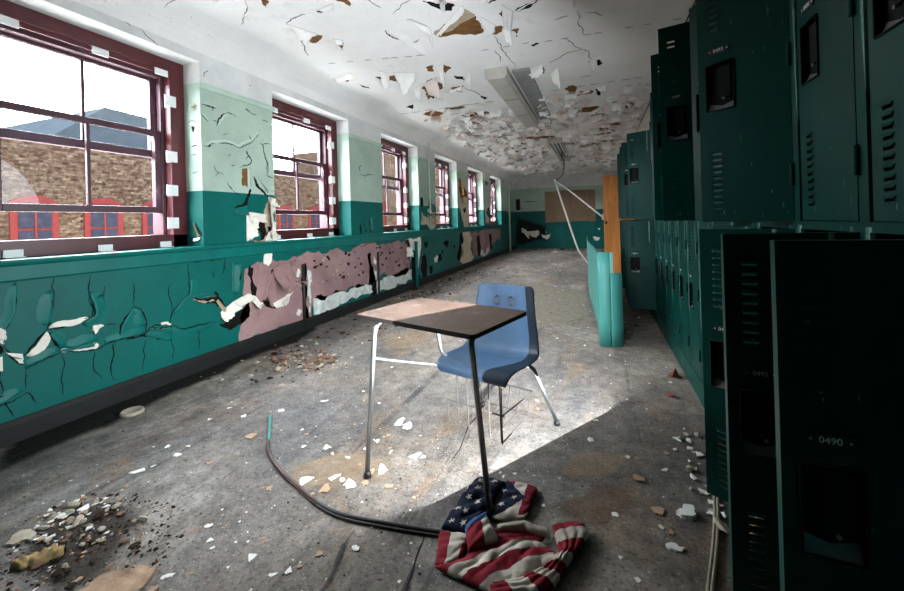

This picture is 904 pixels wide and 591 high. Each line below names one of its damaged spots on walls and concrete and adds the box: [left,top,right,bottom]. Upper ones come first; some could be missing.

peeling [286,14,322,56]
peeling [316,0,351,13]
peeling [406,0,538,48]
crack [487,32,601,69]
peeling [376,39,651,178]
crack [201,102,273,195]
spalling [193,168,501,341]
peeling [0,328,24,371]
peeling [61,324,112,353]
crack [0,259,225,417]